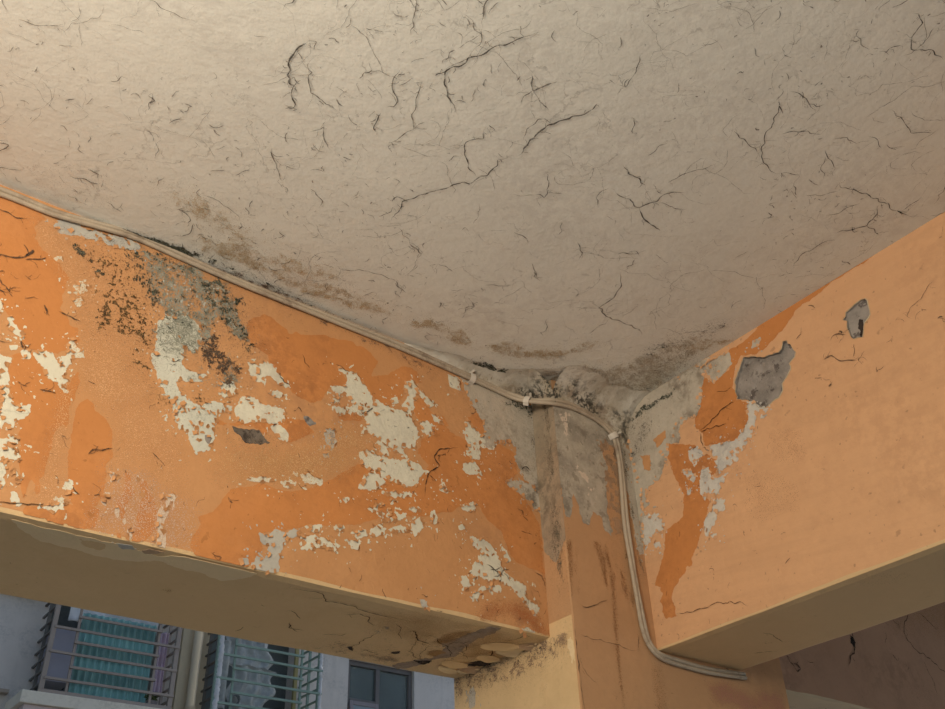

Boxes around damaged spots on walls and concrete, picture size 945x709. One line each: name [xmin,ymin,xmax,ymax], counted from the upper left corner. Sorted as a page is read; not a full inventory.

crack [283,0,530,152]
crack [856,15,943,59]
crack [382,61,640,255]
crack [596,139,708,229]
crack [734,92,945,274]
crack [579,251,642,333]
leakage [31,191,393,554]
peeling [0,197,871,675]
leakage [506,400,557,481]
leakage [488,322,734,457]
crack [289,587,467,659]
crack [848,634,856,664]